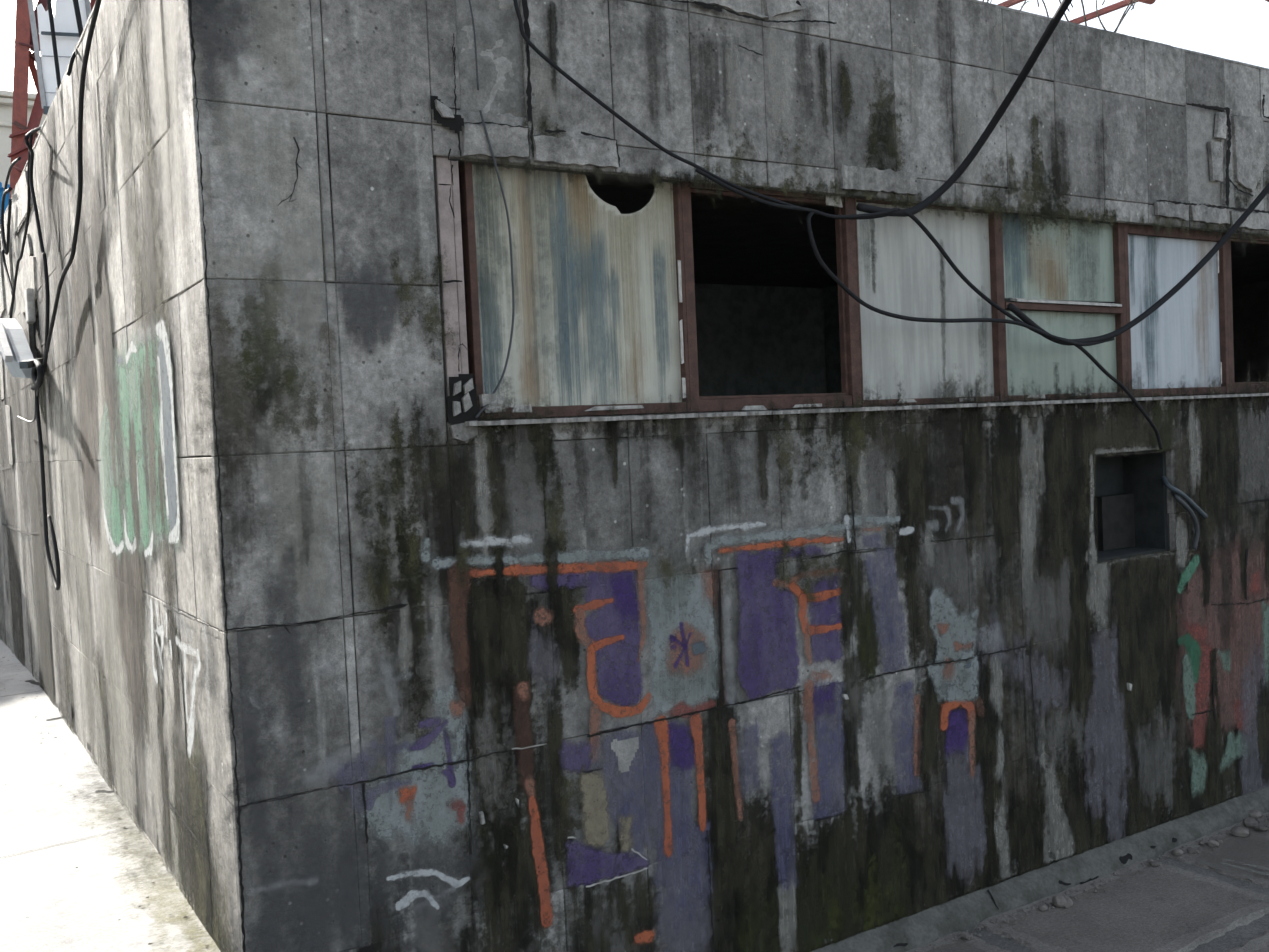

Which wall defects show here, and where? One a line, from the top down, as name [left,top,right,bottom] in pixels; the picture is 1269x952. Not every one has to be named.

crack [56,19,92,136]
spalling [430,0,619,169]
crack [666,0,837,56]
crack [10,198,27,256]
leakage [0,0,669,952]
crack [163,0,545,952]
leakage [461,0,1269,952]
crack [587,570,801,737]
crack [867,641,1034,708]
crack [0,790,205,858]